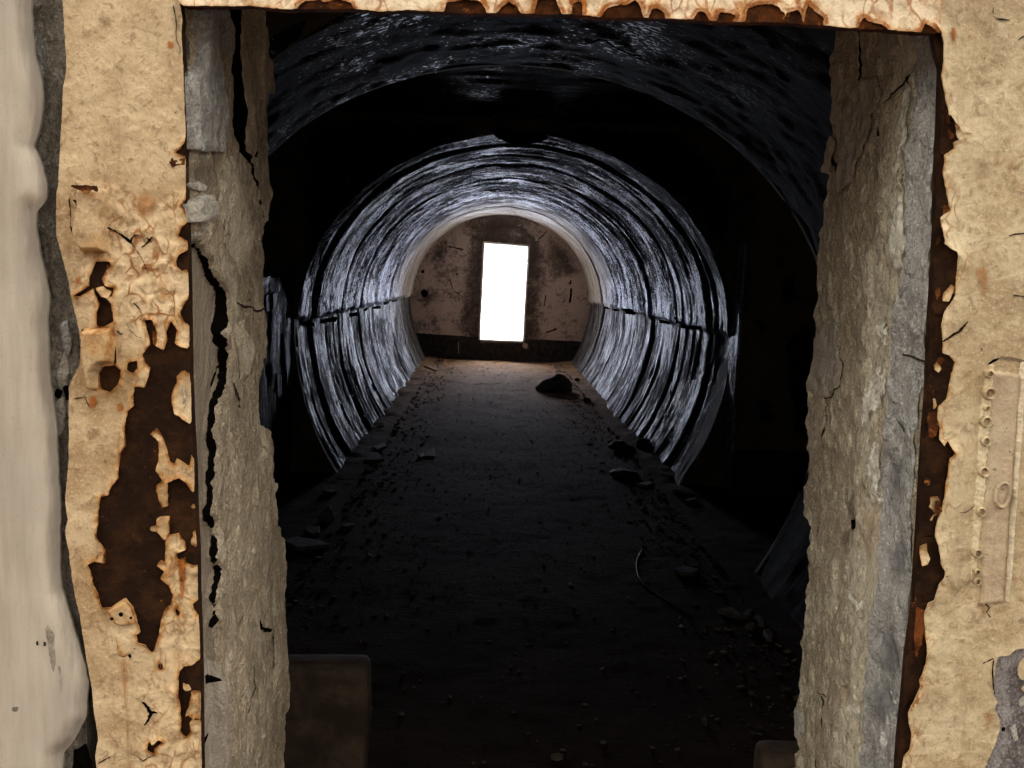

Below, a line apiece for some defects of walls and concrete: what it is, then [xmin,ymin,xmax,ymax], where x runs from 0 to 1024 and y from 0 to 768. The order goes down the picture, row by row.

crack [229,9,265,219]
corrosion [75,261,113,326]
crack [107,227,153,269]
corrosion [88,298,199,652]
crack [192,243,265,634]
corrosion [902,352,954,711]
spalling [72,743,92,768]
spalling [985,649,1024,768]